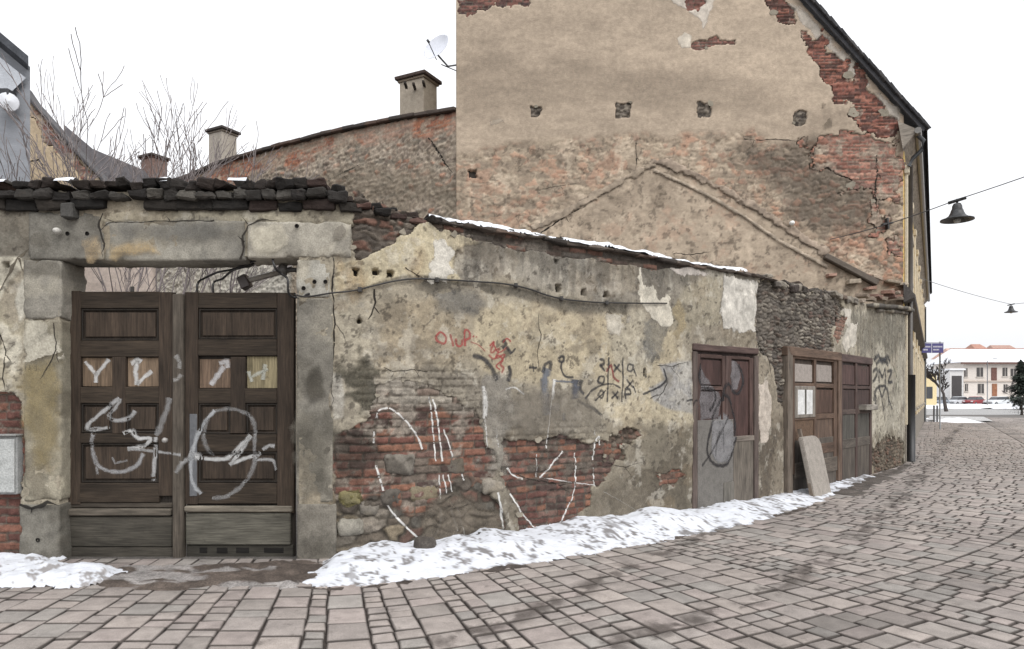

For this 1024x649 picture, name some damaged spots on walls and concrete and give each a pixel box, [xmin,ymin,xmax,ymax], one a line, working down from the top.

flaking render [457,0,530,17]
peeling [672,0,735,50]
crack [428,137,453,173]
flaking render [765,0,906,262]
crack [98,213,214,257]
crack [237,217,276,260]
flaking render [0,392,26,480]
flaking render [499,427,641,530]
flaking render [0,494,22,554]